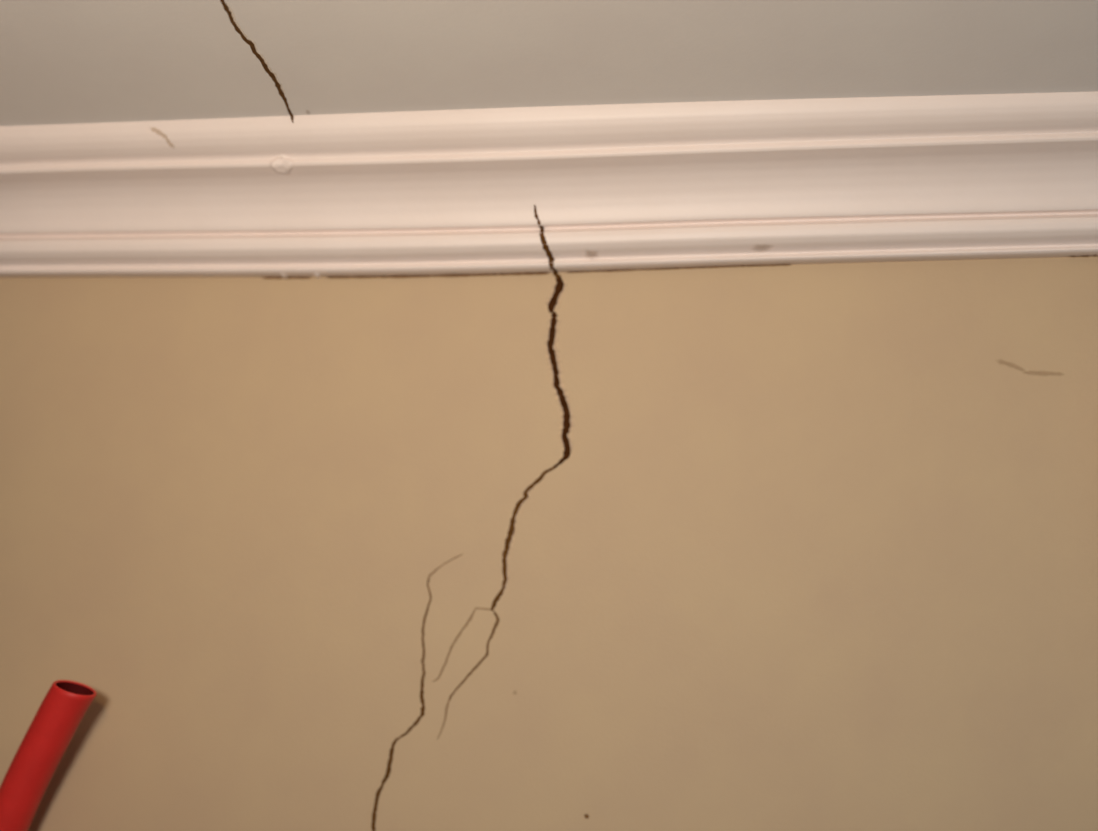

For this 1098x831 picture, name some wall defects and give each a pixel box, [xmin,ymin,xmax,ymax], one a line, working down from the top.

crack [220,0,294,123]
crack [371,205,572,831]